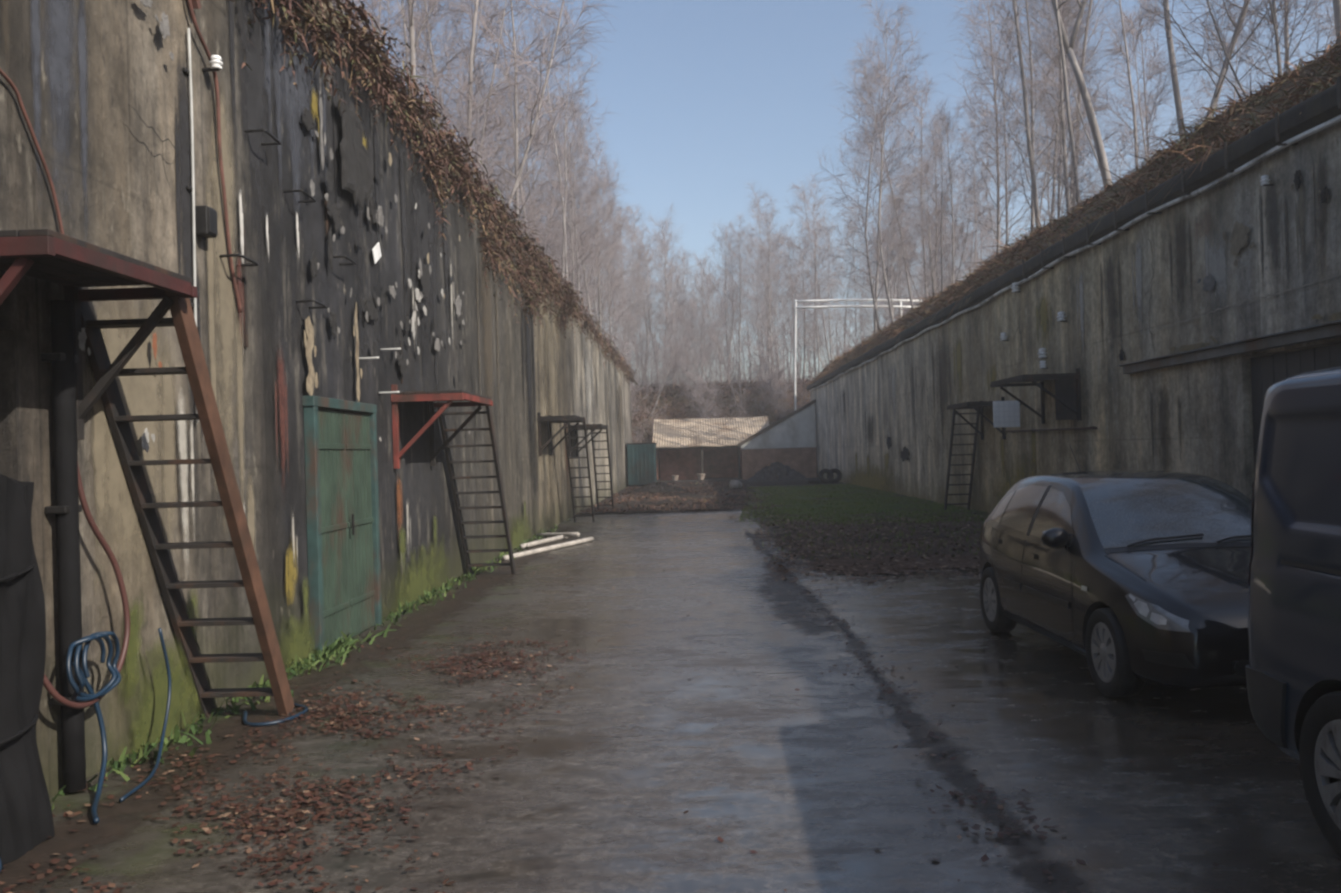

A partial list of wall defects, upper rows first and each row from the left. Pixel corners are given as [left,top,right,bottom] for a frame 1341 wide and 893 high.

spalling [367,194,398,250]
damp [1169,217,1227,302]
damp [1260,163,1326,273]
peeling [304,315,318,396]
peeling [327,252,465,401]